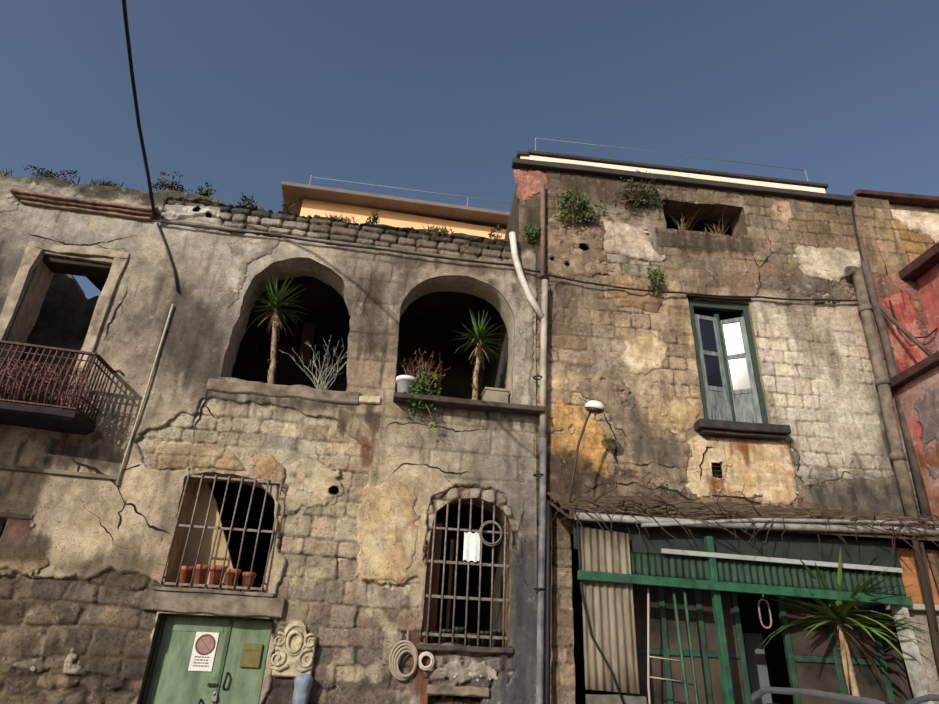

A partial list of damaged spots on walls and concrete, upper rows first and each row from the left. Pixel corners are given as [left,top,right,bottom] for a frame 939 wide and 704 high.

crack [26,229,144,251]
flaking render [546,211,666,281]
flaking render [780,245,862,309]
crack [193,390,214,436]
crack [387,422,490,482]
water stain [547,450,603,496]
crack [577,396,783,508]
flaking render [913,382,939,480]
peeling [1,519,35,545]
crack [73,461,170,560]
flaking render [137,398,518,704]
flaking render [0,568,166,704]